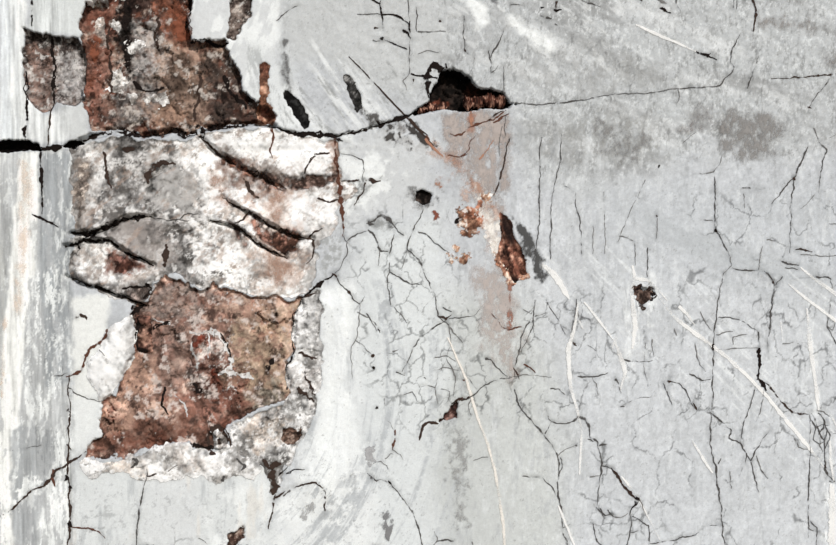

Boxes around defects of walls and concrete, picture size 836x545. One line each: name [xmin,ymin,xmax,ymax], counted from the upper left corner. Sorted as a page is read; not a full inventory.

crack [8,329,108,545]
crack [22,71,192,311]
spalling [22,0,358,495]
crack [83,112,836,545]
rust [430,110,548,376]
crack [360,0,832,196]
hole [632,284,657,310]